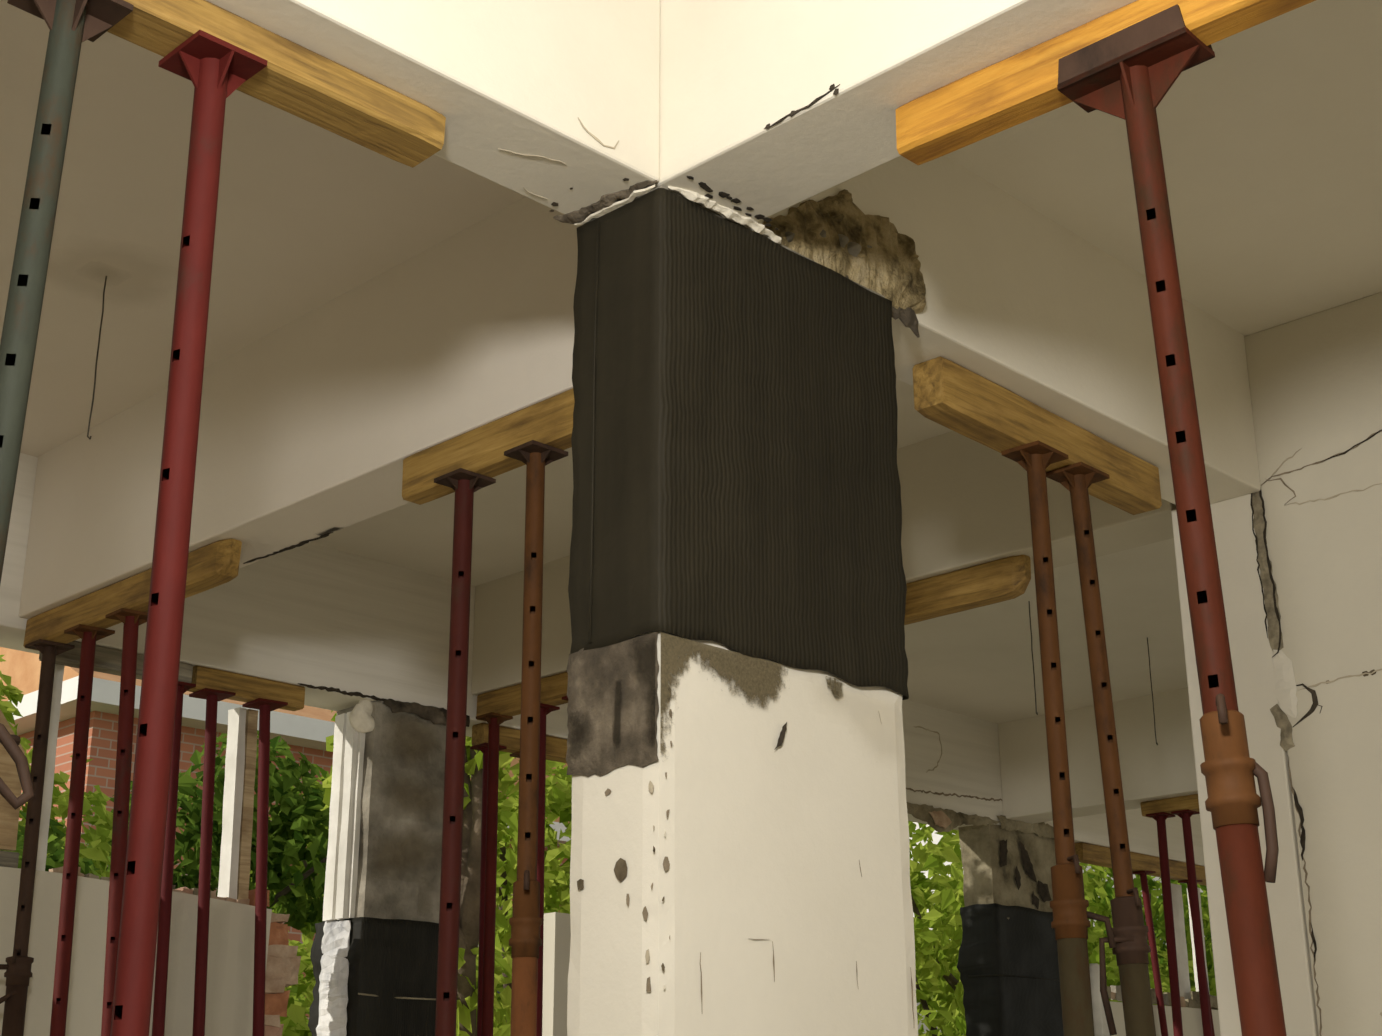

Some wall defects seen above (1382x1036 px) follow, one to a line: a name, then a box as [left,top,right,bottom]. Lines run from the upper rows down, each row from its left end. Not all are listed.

crack [764,84,840,129]
spalling [550,176,926,338]
crack [243,527,340,564]
crack [1250,430,1382,719]
peeling [566,631,672,796]
flaking render [774,722,787,750]
flaking render [653,809,670,871]
flaking render [907,802,1054,909]
flaking render [614,858,648,921]
crack [1287,755,1322,1036]
flaking render [645,949,666,992]